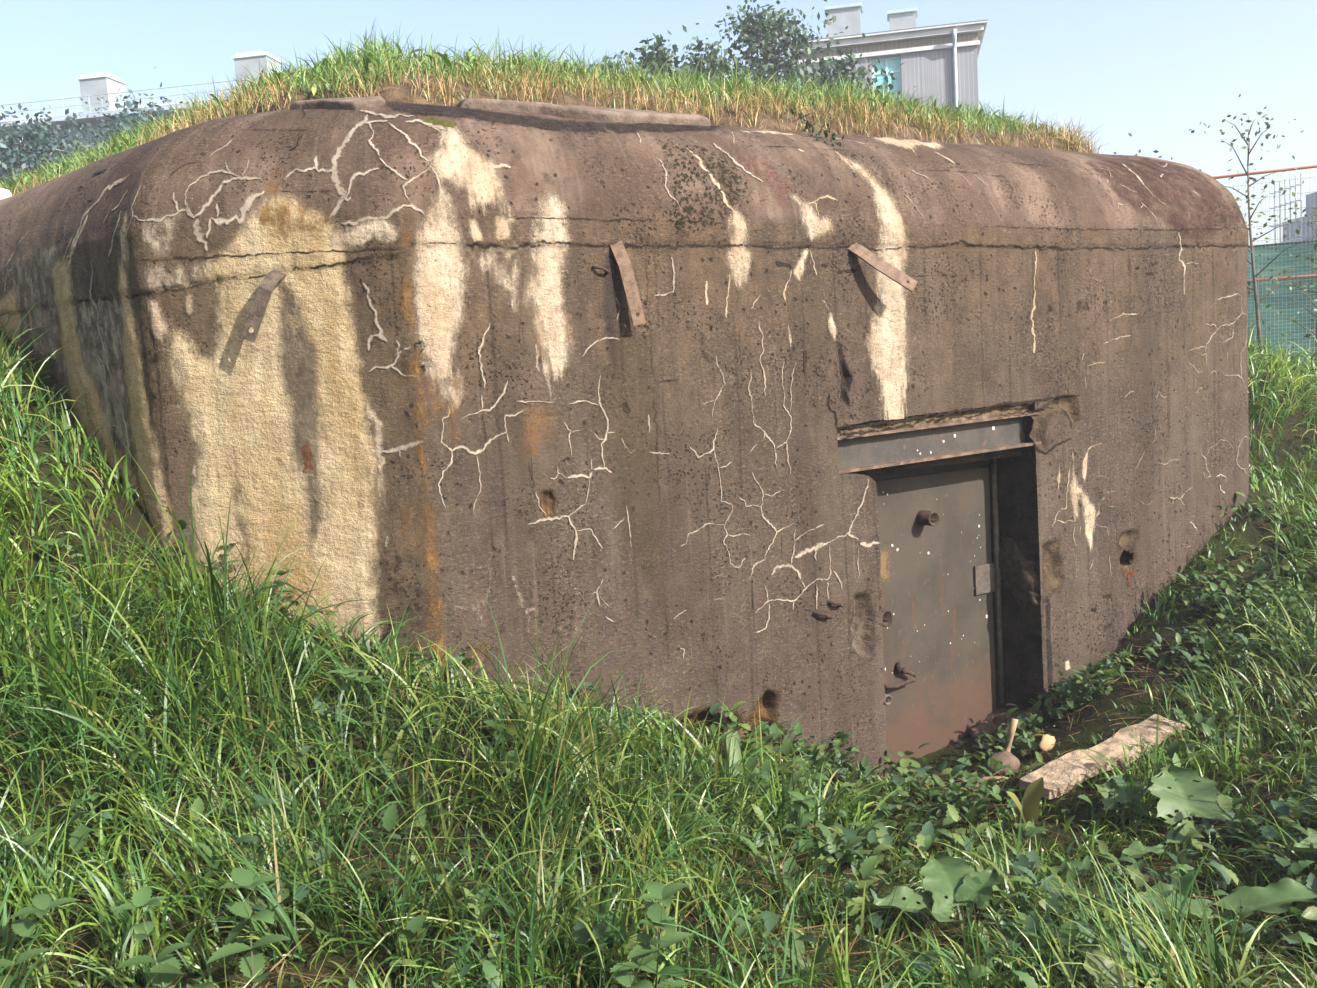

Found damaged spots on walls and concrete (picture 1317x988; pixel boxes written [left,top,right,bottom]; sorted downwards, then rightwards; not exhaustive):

crack [88,109,449,377]
corrosion [400,273,415,328]
damp [386,101,717,406]
crack [654,257,675,296]
damp [687,148,751,318]
damp [835,134,955,420]
damp [0,176,428,651]
spalling [540,490,556,517]
crack [381,297,879,633]
spalling [1029,395,1079,451]
corrosion [425,512,445,675]
spalling [679,690,779,749]